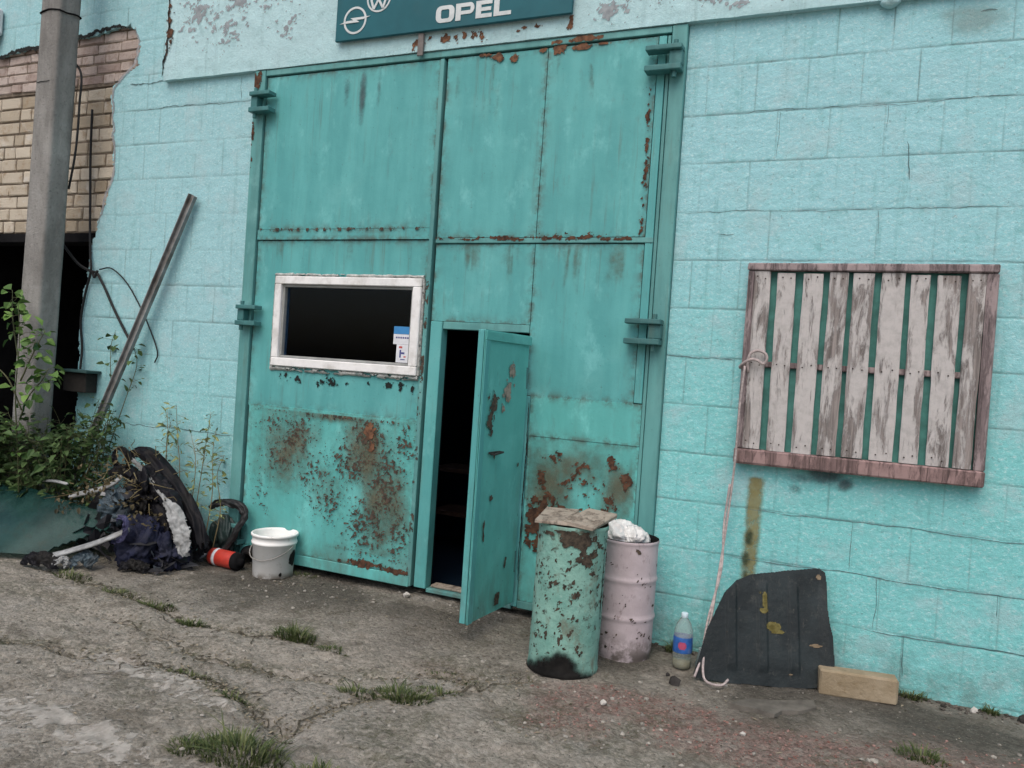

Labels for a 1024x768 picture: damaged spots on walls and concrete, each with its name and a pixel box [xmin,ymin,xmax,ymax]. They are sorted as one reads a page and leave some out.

crack [131,0,170,85]
peeling [178,0,306,55]
corrosion [412,31,519,62]
corrosion [539,15,612,55]
flaking render [0,46,39,234]
flaking render [65,24,141,234]
corrosion [435,89,651,242]
corrosion [487,391,500,437]
corrosion [246,355,424,576]
corrosion [517,450,633,552]
damp [742,477,763,577]
crack [3,571,524,745]